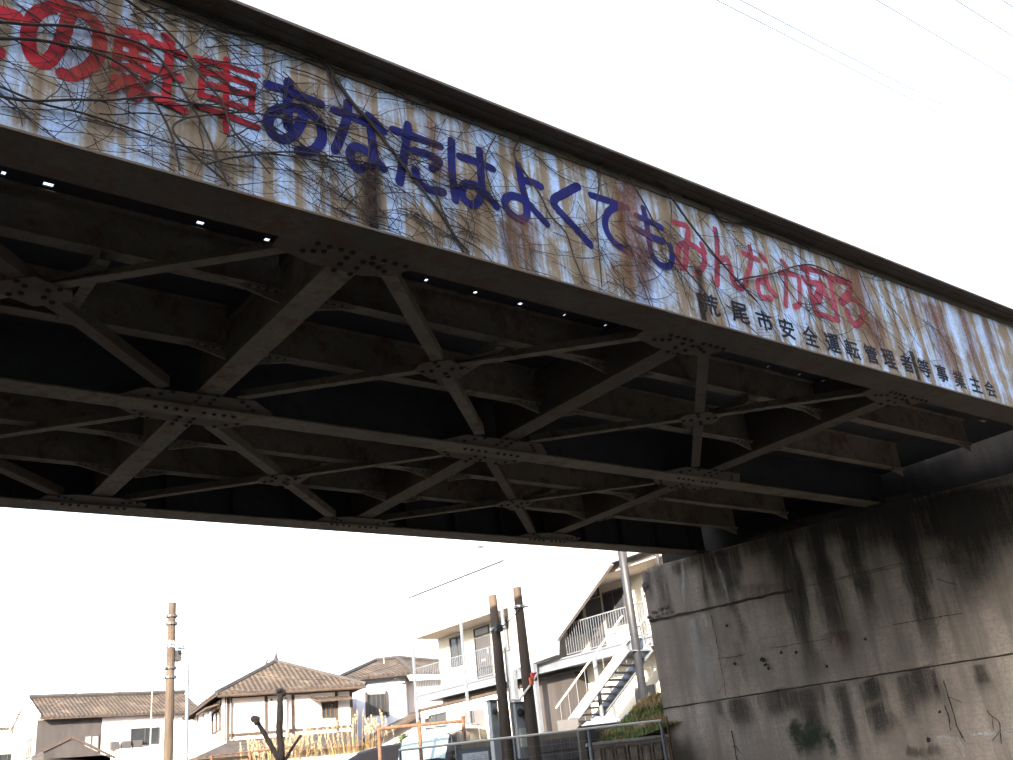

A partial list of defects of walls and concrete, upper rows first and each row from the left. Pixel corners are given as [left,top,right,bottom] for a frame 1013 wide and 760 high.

rust [695,269,707,314]
rust [959,309,976,355]
damp [672,485,1013,648]
damp [975,665,989,682]
damp [765,687,856,754]
damp [860,678,893,731]
crack [943,681,965,741]